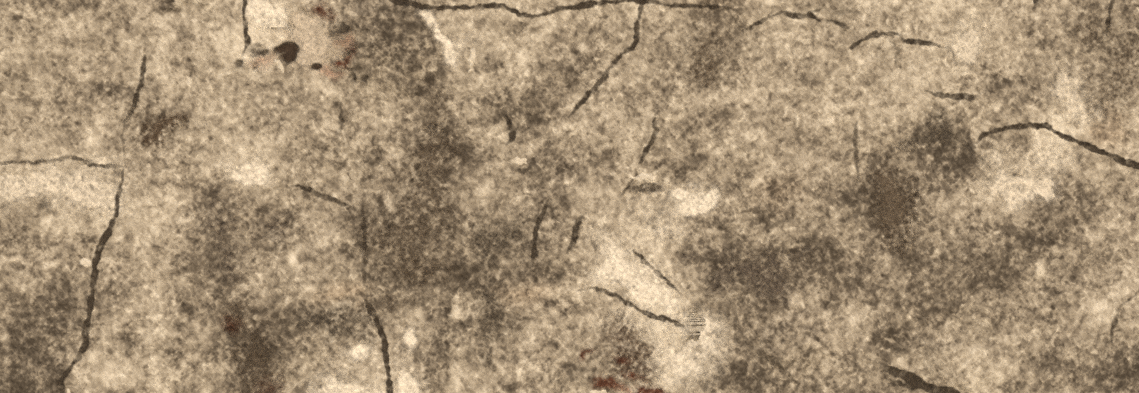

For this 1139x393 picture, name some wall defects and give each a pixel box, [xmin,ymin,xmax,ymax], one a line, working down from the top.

crack [242,0,251,49]
crack [750,11,932,49]
crack [389,0,718,113]
crack [978,122,1139,169]
crack [57,157,124,393]
crack [635,252,675,288]
crack [595,287,680,326]
crack [366,303,393,393]
crack [887,366,960,393]